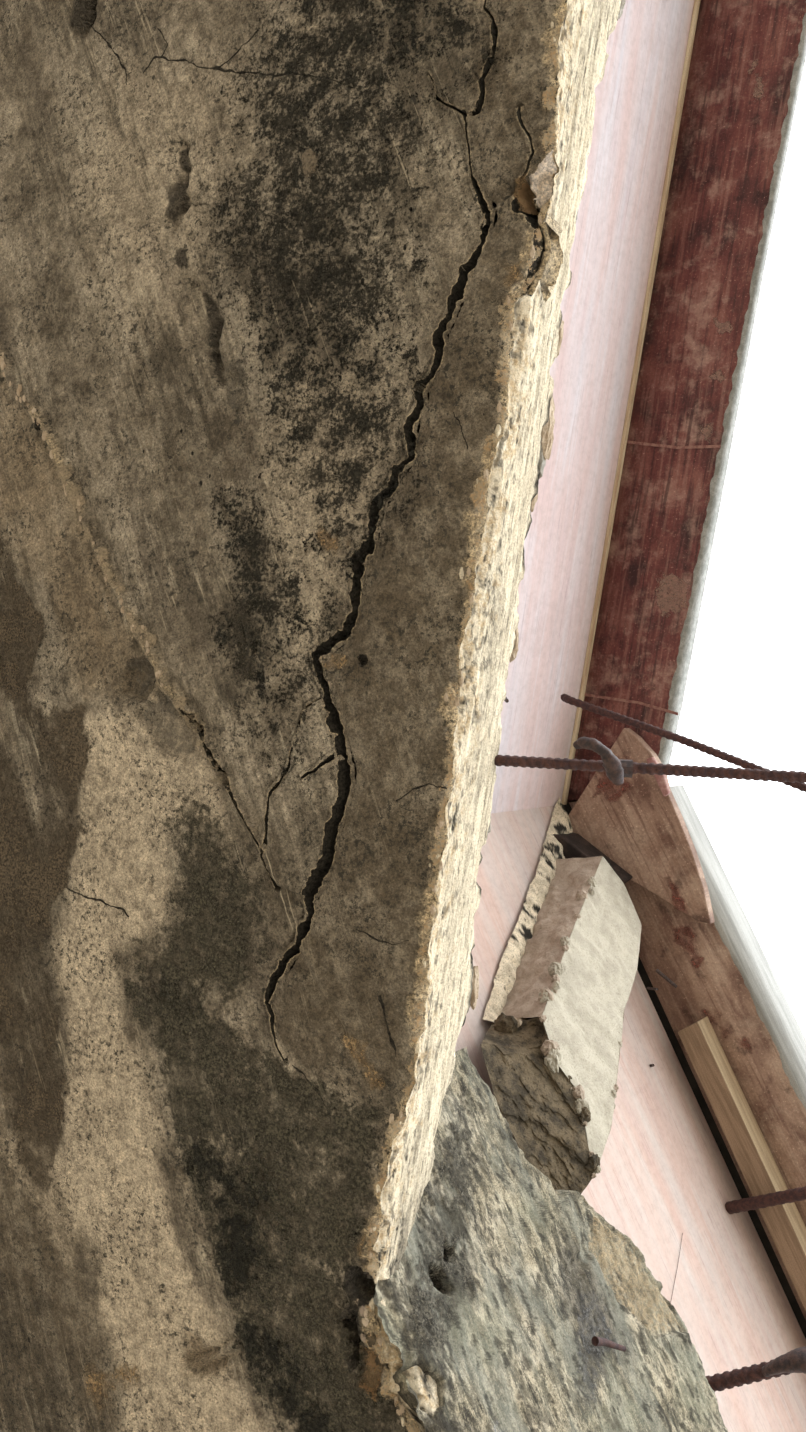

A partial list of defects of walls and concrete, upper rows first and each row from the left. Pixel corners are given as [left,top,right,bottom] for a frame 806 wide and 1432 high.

crack [91,25,354,88]
damp [192,0,519,783]
crack [177,0,551,1109]
spalling [373,11,565,1196]
damp [98,786,407,1432]
spalling [339,1215,419,1432]